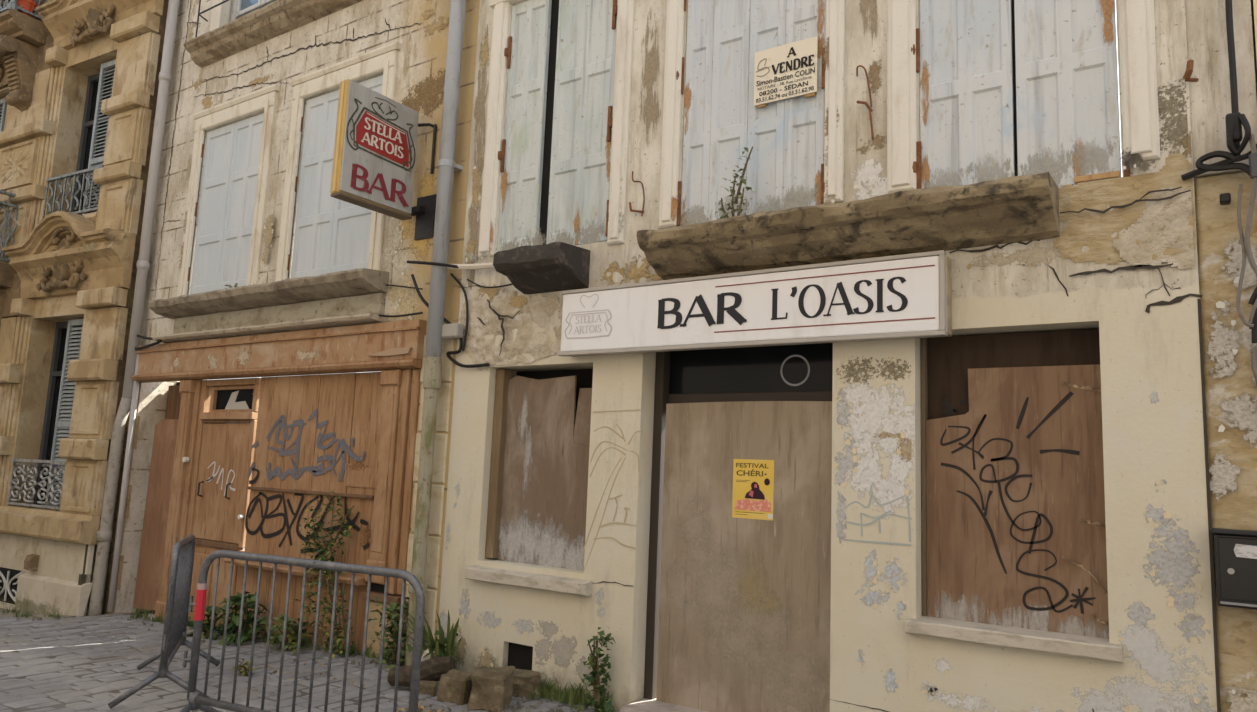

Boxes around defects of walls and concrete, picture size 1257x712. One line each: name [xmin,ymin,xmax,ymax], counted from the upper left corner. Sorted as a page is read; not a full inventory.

peeling [481,33,489,78]
corrosion [1100,0,1114,42]
peeling [472,152,481,207]
spalling [967,153,1196,270]
peeling [1220,238,1257,289]
spalling [459,284,563,371]
peeling [1206,300,1257,449]
peeling [833,378,915,542]
peeling [1209,450,1240,501]
peeling [439,588,593,690]
peeling [1059,479,1257,712]
peeling [920,658,1042,712]